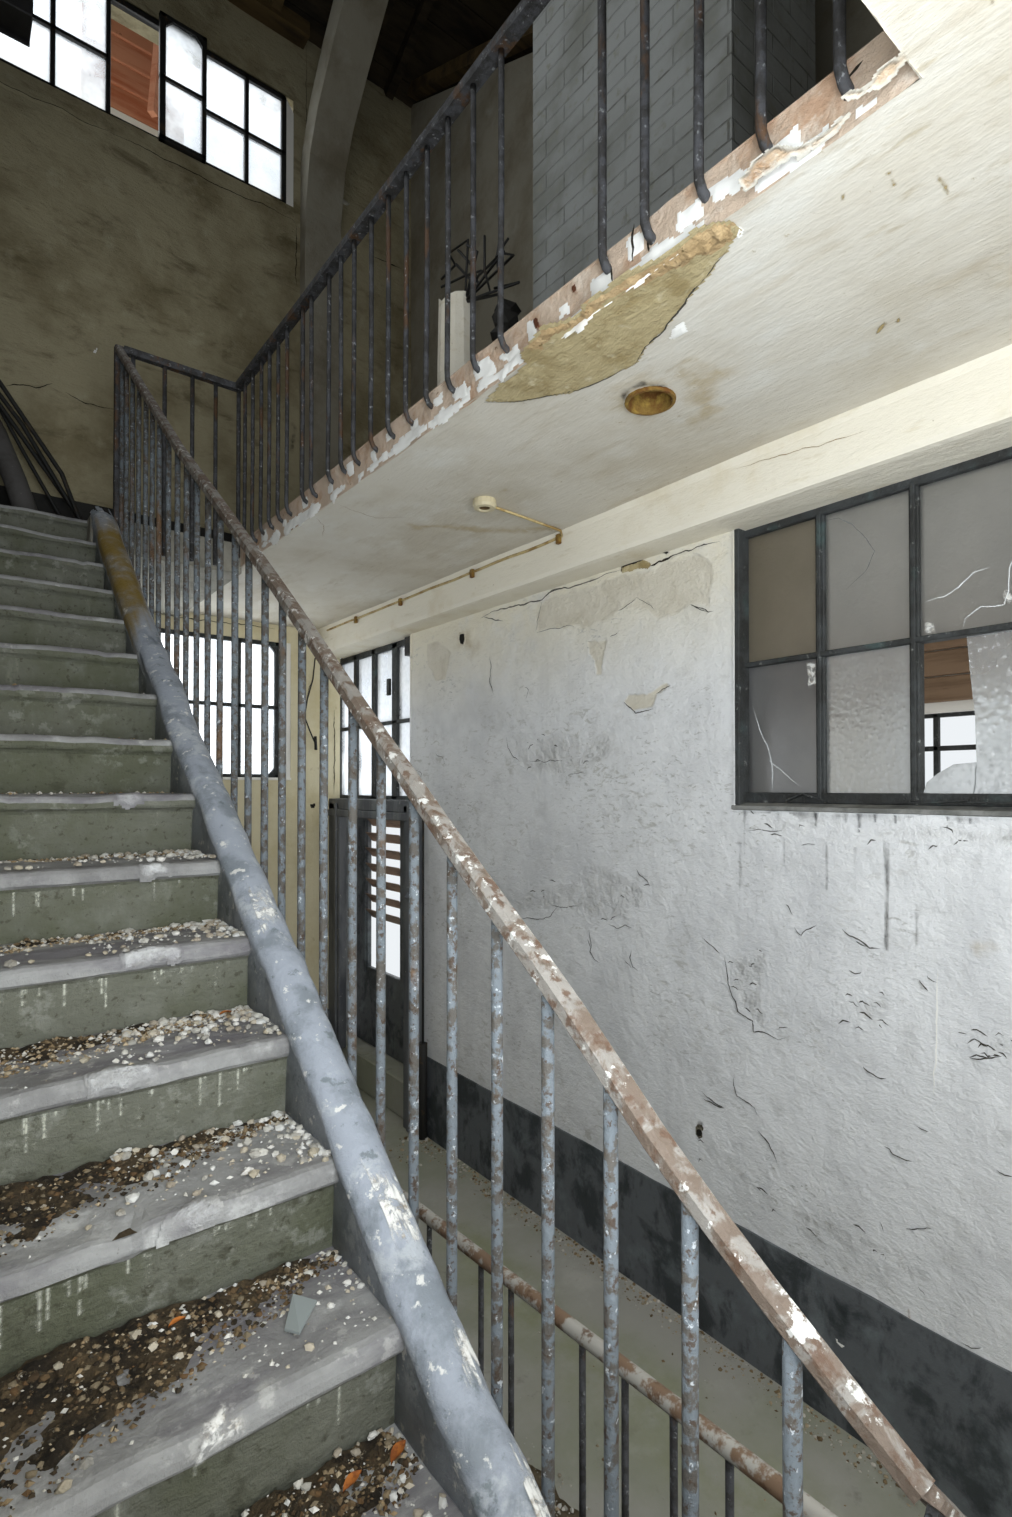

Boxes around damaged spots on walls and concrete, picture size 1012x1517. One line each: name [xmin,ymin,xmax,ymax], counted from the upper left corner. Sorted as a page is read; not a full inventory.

spalling [258,51,912,548]
peeling [623,681,671,712]
crack [704,939,787,1041]
crack [786,905,879,1019]
crack [863,1067,886,1082]